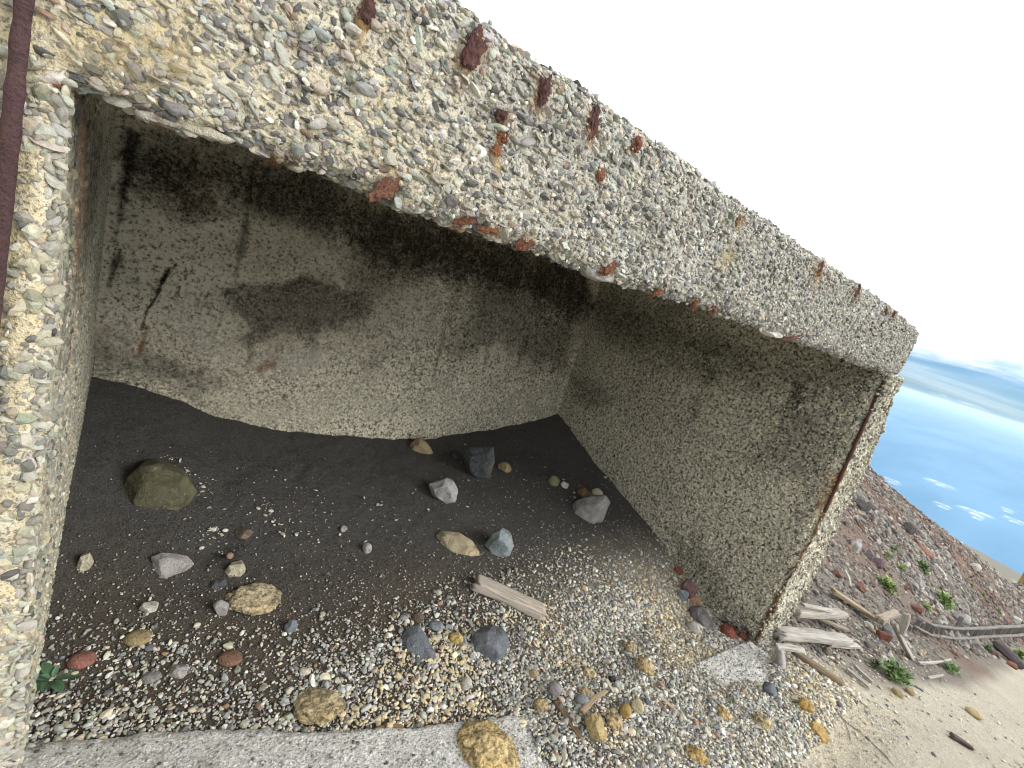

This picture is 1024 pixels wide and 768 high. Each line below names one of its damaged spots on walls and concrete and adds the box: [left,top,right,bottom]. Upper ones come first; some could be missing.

corrosion [357,0,376,34]
corrosion [460,24,488,72]
corrosion [535,74,553,109]
corrosion [491,107,510,157]
corrosion [586,104,601,141]
corrosion [631,136,643,153]
corrosion [367,176,404,203]
corrosion [451,216,499,236]
water stain [115,129,755,383]
corrosion [513,238,538,251]
corrosion [599,260,620,277]
crack [139,265,176,355]